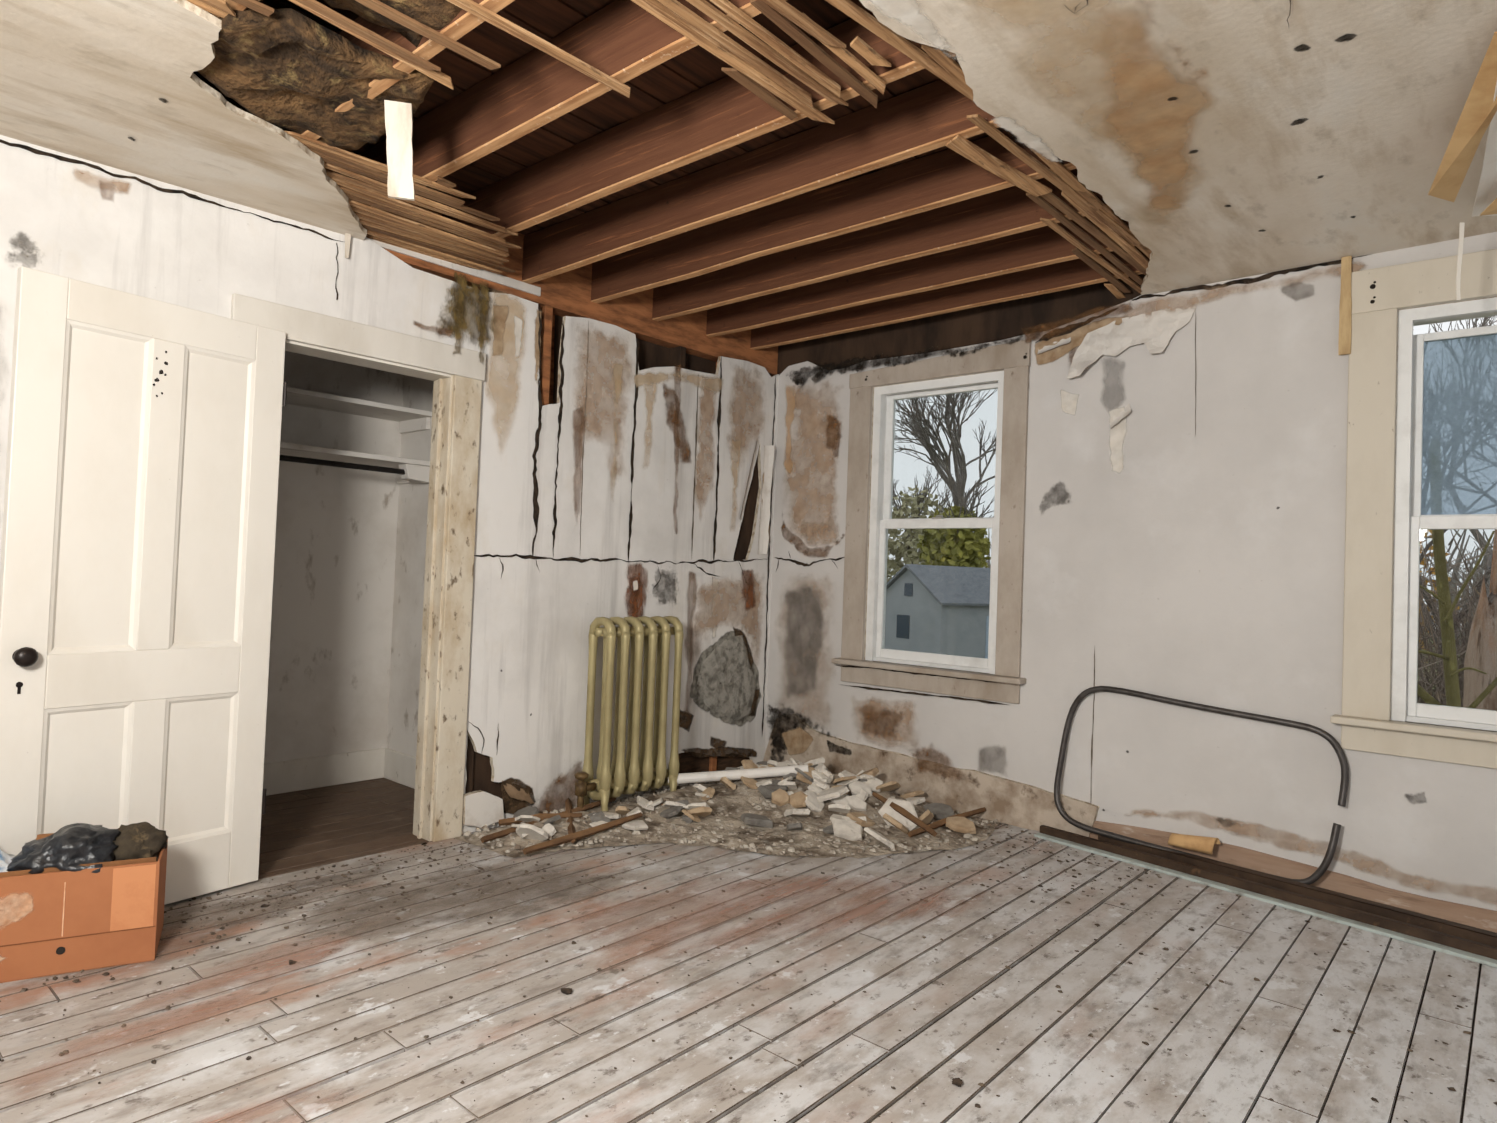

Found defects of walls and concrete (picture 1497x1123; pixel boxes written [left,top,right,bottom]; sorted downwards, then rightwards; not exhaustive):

peeling [871,0,949,50]
peeling [994,117,1058,162]
water stain [10,233,36,262]
crack [0,139,343,300]
water stain [574,333,629,477]
water stain [646,365,714,501]
peeling [1035,307,1196,473]
crack [474,305,844,734]
flaking render [462,751,535,828]
flaking render [678,627,761,774]
water stain [768,588,851,762]
water stain [858,700,961,779]